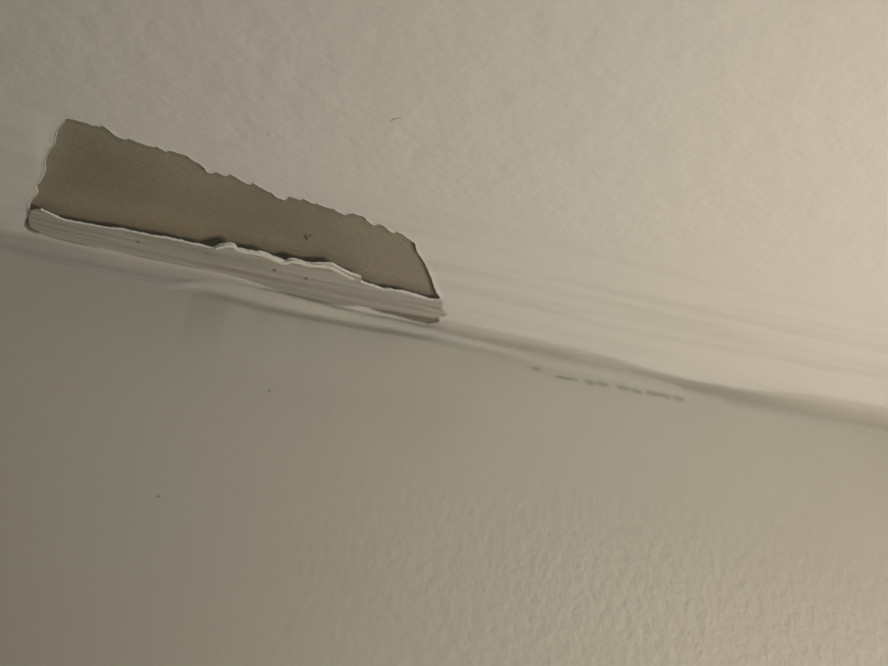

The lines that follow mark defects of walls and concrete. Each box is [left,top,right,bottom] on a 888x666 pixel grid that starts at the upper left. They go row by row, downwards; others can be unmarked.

peeling [24,116,448,324]